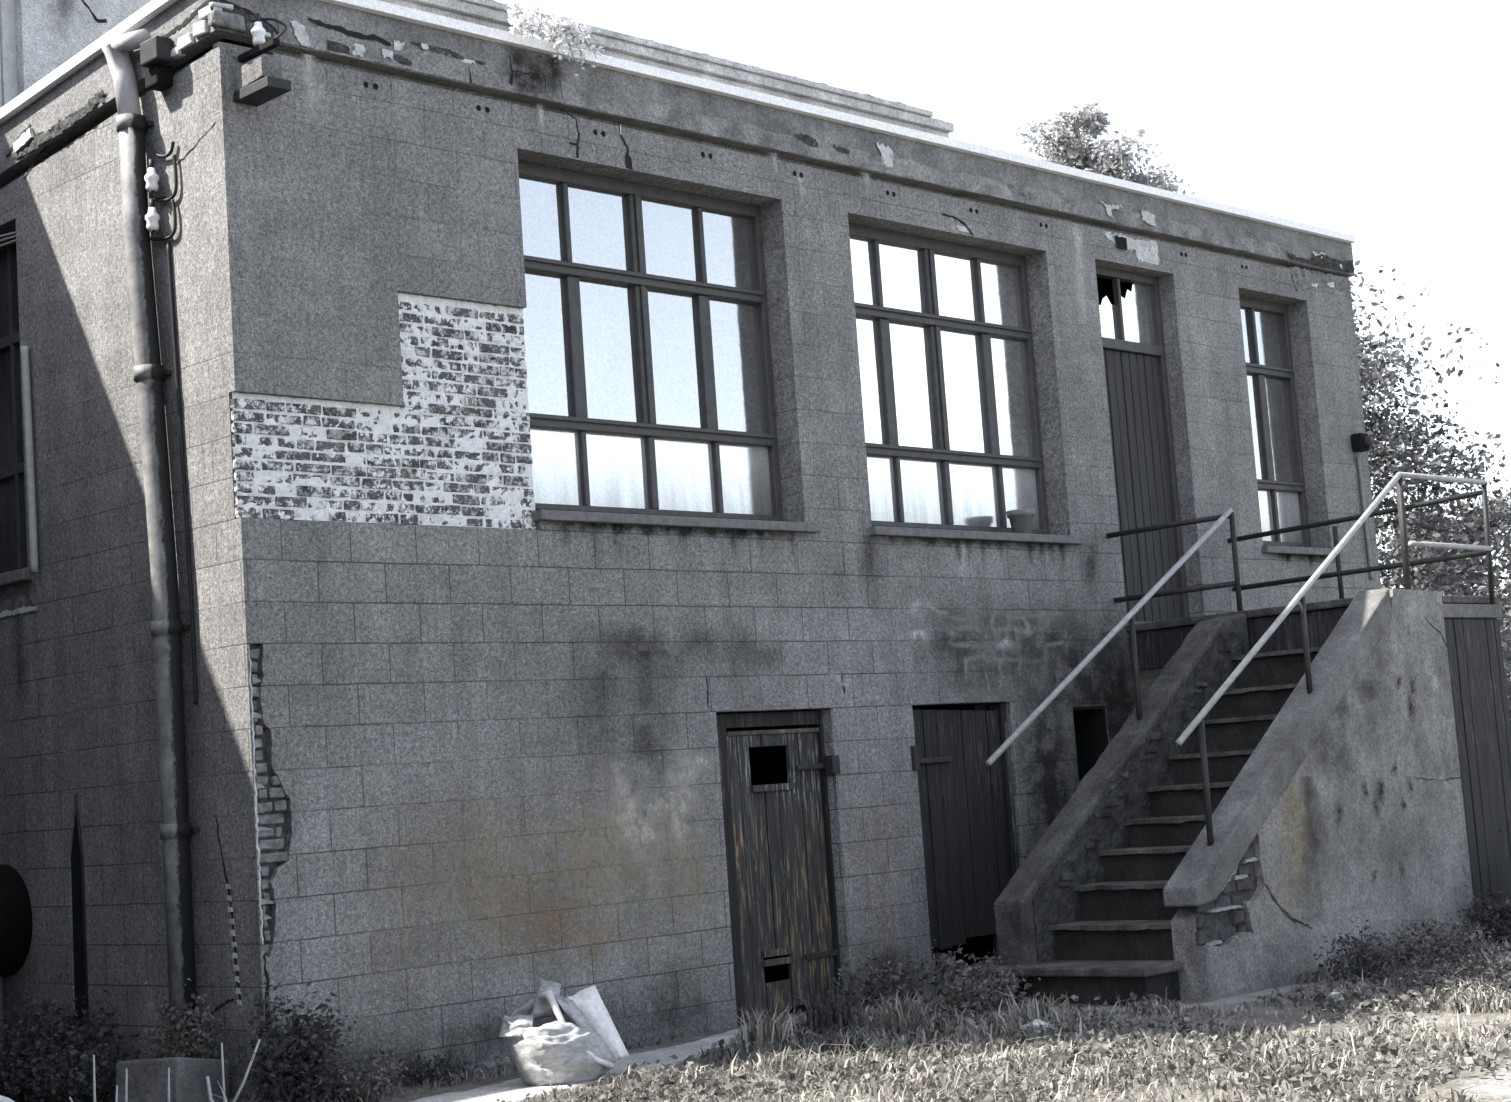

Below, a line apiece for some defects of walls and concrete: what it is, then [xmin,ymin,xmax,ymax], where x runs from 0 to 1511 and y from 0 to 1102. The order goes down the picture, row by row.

spalling [162,0,486,65]
spalling [1097,197,1159,265]
spalling [1286,250,1355,293]
peeling [230,293,536,530]
spalling [248,644,288,955]
leakage [618,760,702,843]
spalling [1033,632,1246,963]
spalling [1194,841,1258,946]